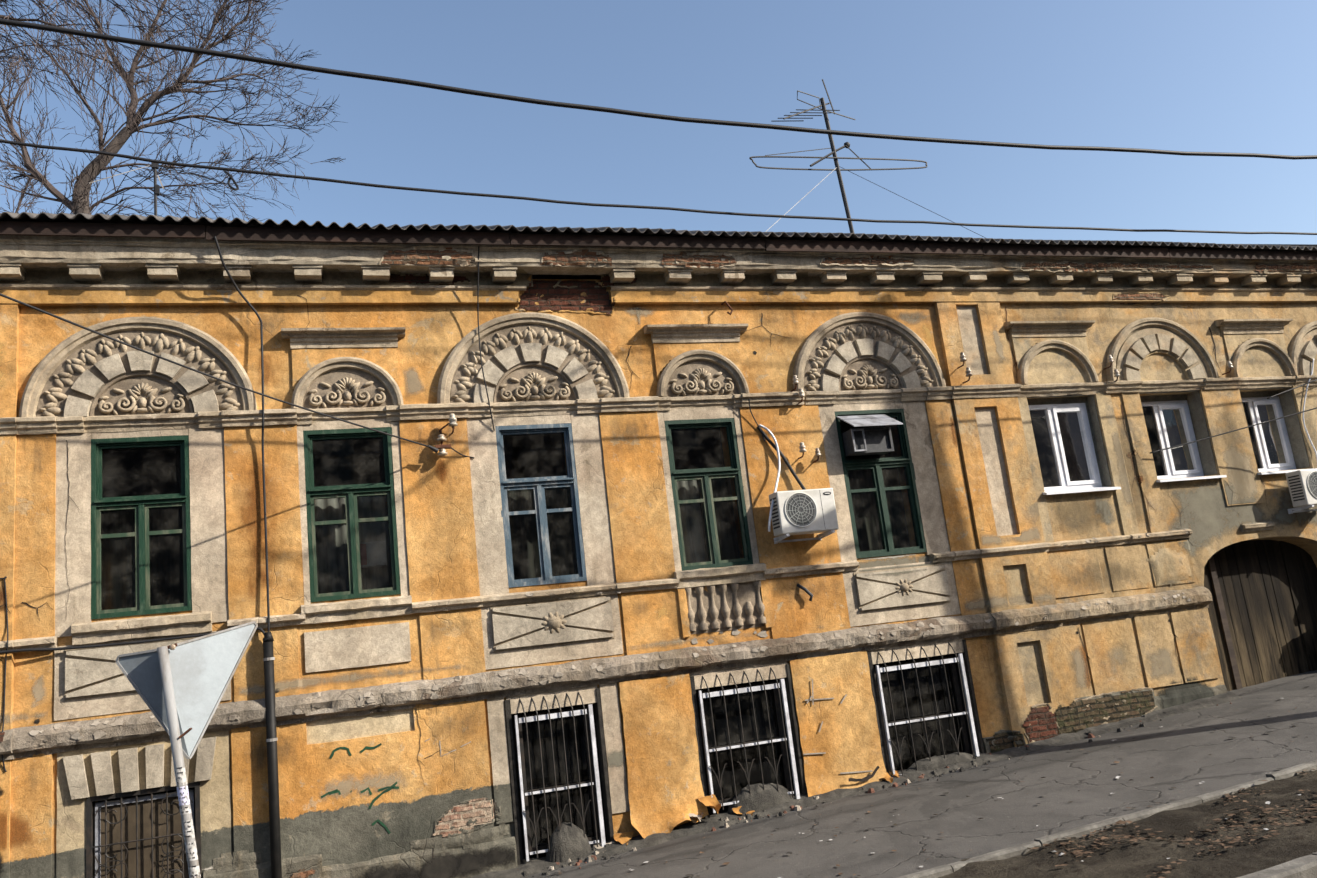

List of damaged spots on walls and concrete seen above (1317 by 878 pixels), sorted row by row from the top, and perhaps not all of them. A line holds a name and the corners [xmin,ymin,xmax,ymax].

flaking render [378,245,475,285]
flaking render [514,248,639,316]
crack [0,440,81,620]
peeling [498,663,606,687]
peeling [691,629,768,657]
peeling [593,655,754,849]
flaking render [986,687,1157,753]
flaking render [433,798,502,839]